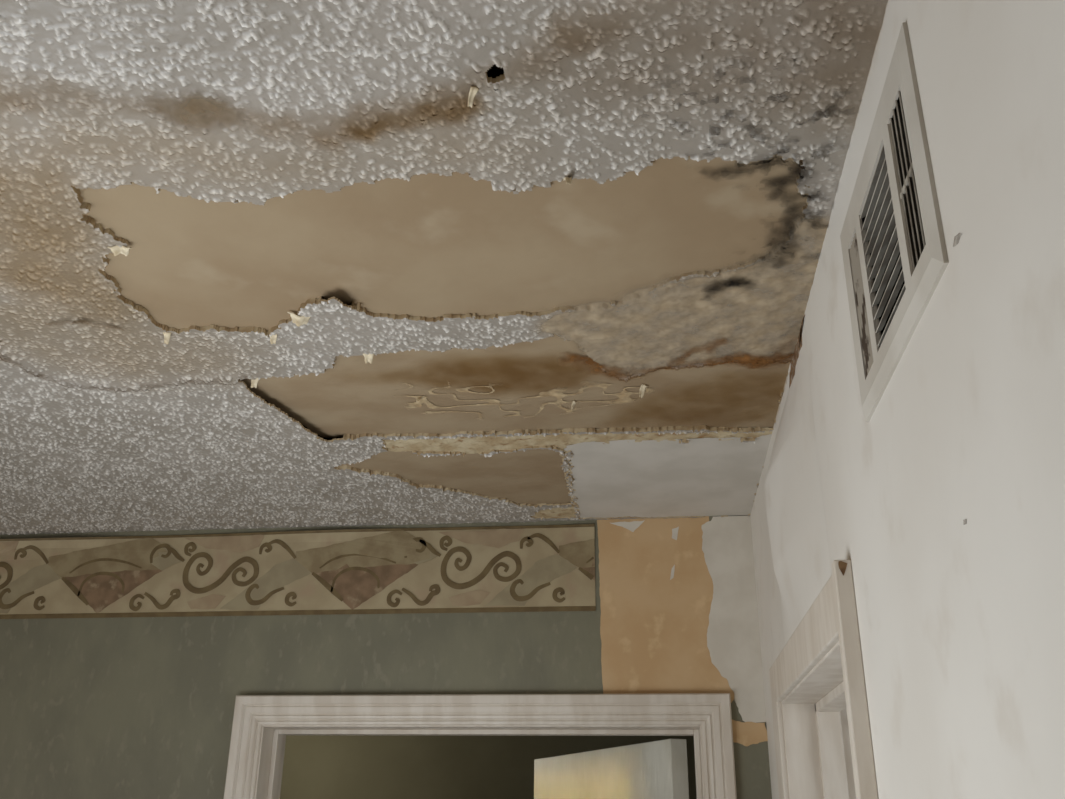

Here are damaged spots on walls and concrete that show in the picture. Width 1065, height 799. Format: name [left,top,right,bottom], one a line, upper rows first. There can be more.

peeling [79,154,808,344]
leakage [705,279,751,298]
leakage [770,152,814,253]
peeling [222,315,805,505]
peeling [609,520,645,532]